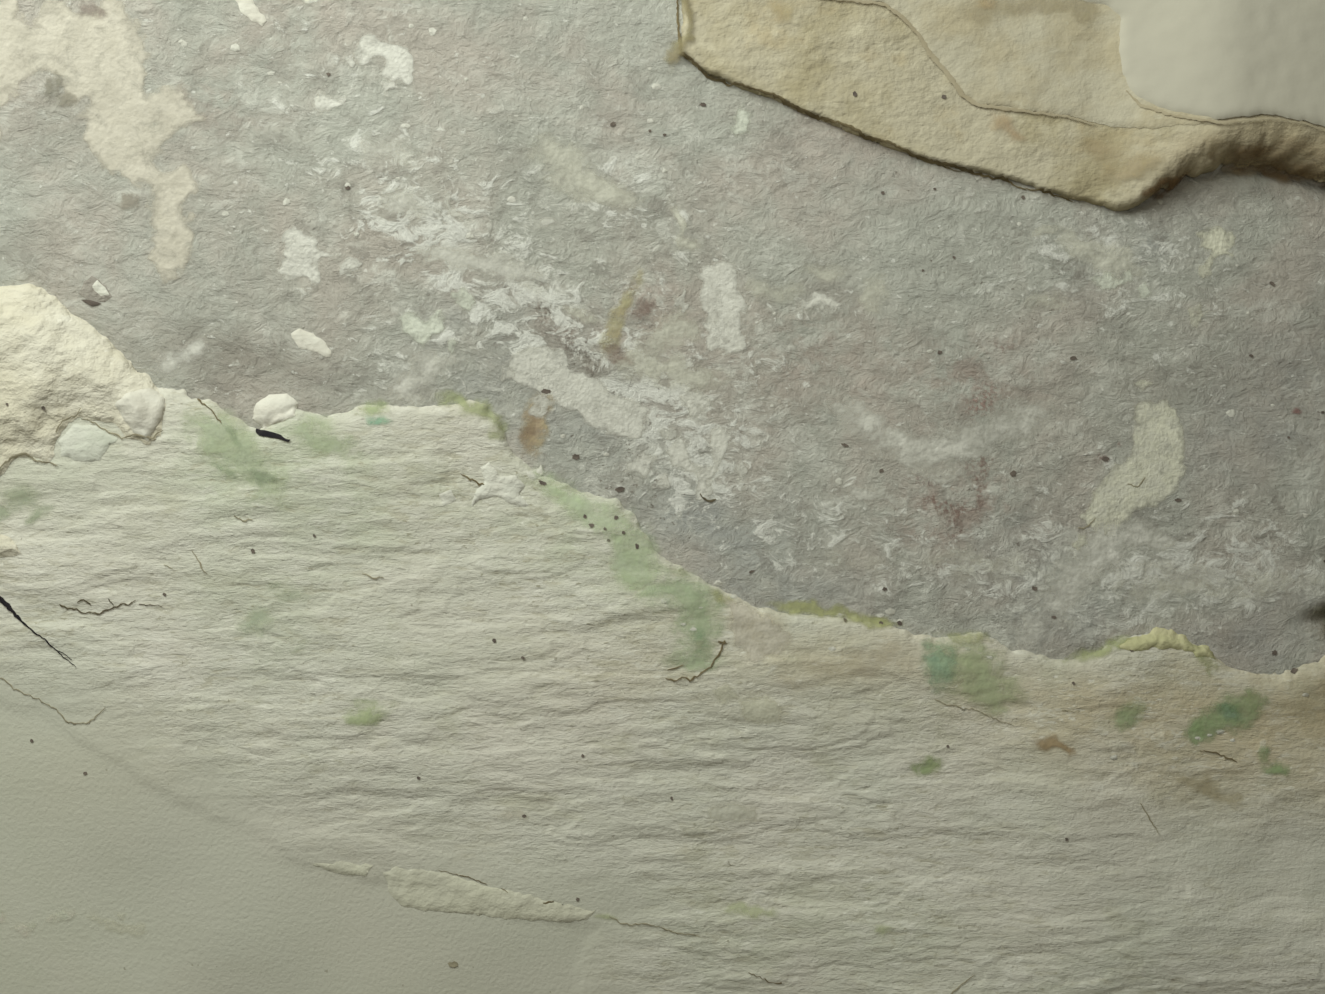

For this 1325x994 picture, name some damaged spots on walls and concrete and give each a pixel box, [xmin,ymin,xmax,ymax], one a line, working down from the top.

leakage [1227,139,1325,181]
leakage [1143,172,1187,198]
spalling [0,0,1325,675]
crack [59,599,162,615]
crack [0,596,76,667]
crack [665,640,727,682]